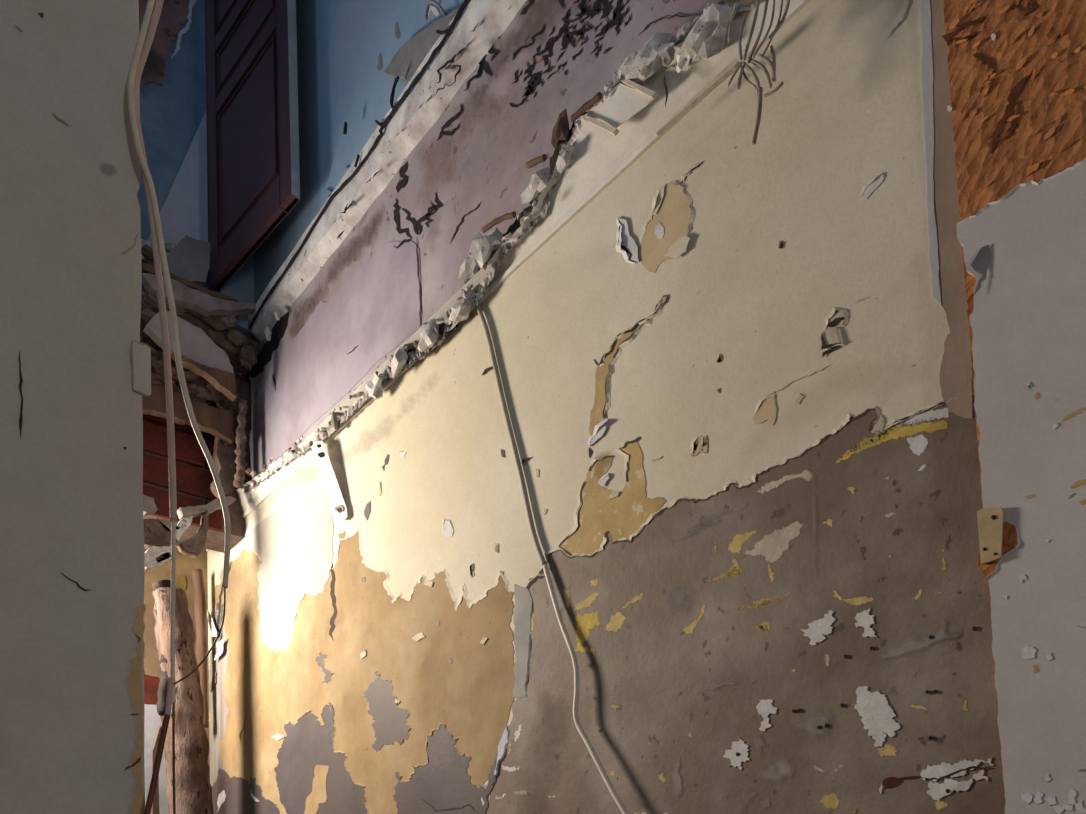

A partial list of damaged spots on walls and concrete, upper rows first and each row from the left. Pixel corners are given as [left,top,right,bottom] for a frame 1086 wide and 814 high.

crack [437,0,699,141]
spalling [942,3,996,98]
spalling [969,56,1036,154]
crack [393,162,480,327]
spalling [461,172,564,307]
crack [618,220,637,263]
peeling [615,180,695,273]
crack [17,350,25,436]
peeling [243,241,458,494]
crack [593,295,668,367]
crack [329,563,337,641]
peeling [207,296,1020,814]